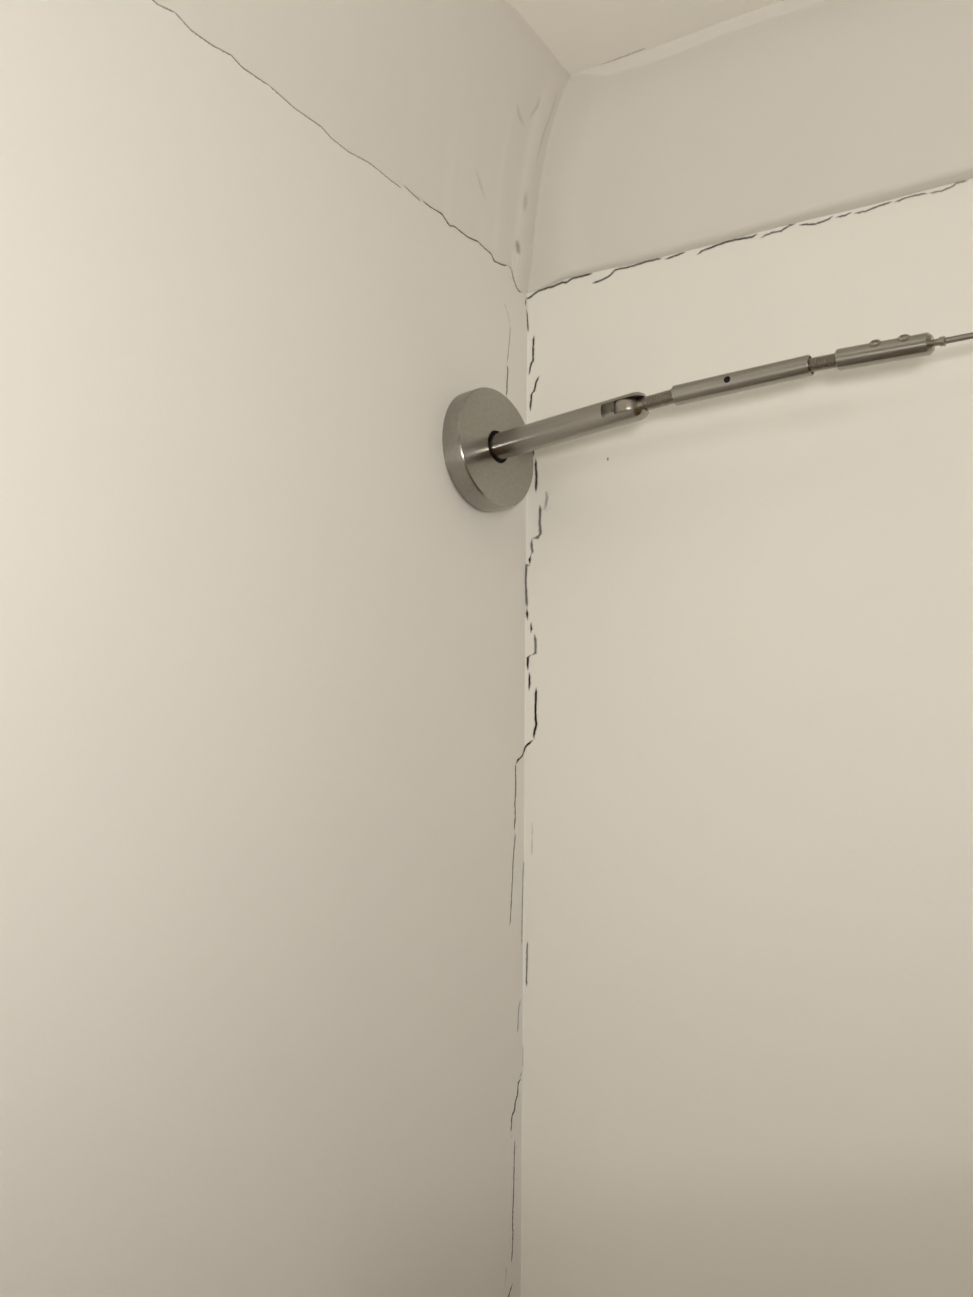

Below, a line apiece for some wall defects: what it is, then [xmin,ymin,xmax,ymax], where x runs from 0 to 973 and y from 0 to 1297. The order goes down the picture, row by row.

crack [151,0,969,412]
crack [504,450,543,1297]